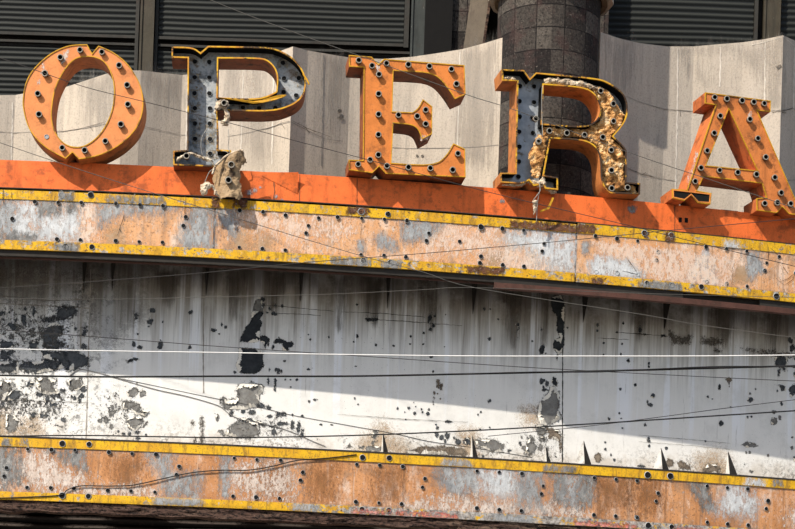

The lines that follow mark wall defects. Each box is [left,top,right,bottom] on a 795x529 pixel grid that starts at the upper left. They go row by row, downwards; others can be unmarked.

corrosion [231,199,248,209]
corrosion [346,206,370,216]
corrosion [509,220,597,234]
corrosion [464,265,506,275]
peeling [531,295,568,359]
leakage [668,330,723,353]
peeling [214,297,304,447]
peeling [0,300,204,506]
peeling [344,430,381,452]
peeling [350,370,637,529]
peeling [212,455,320,512]